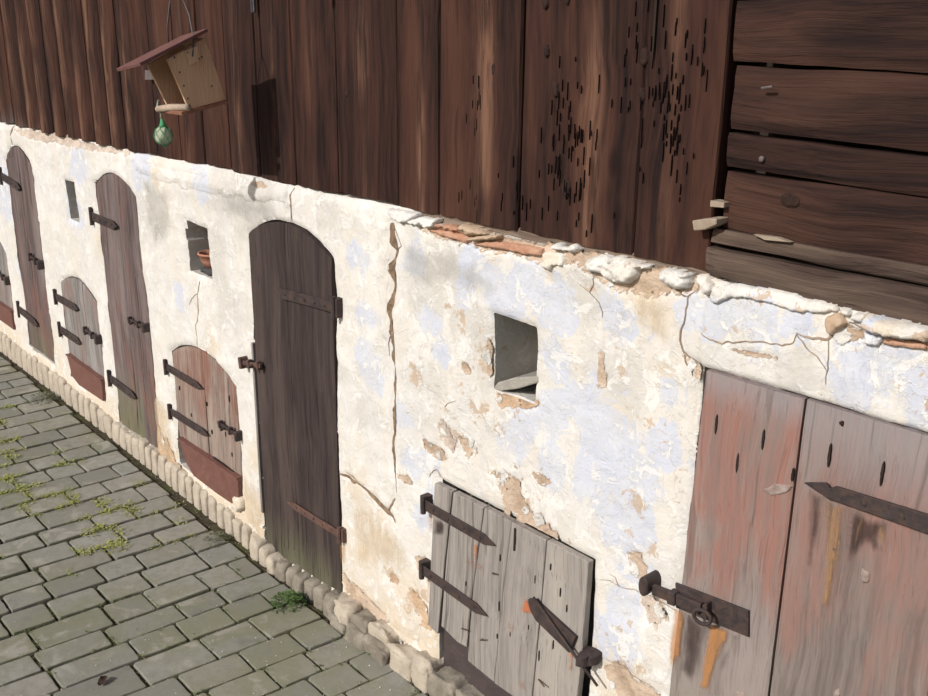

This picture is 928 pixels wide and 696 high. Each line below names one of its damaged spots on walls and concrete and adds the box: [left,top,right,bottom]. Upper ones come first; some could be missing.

flaking render [417,226,708,298]
crack [677,274,862,385]
crack [339,223,401,523]
flaking render [488,466,558,540]
rust [670,611,726,687]